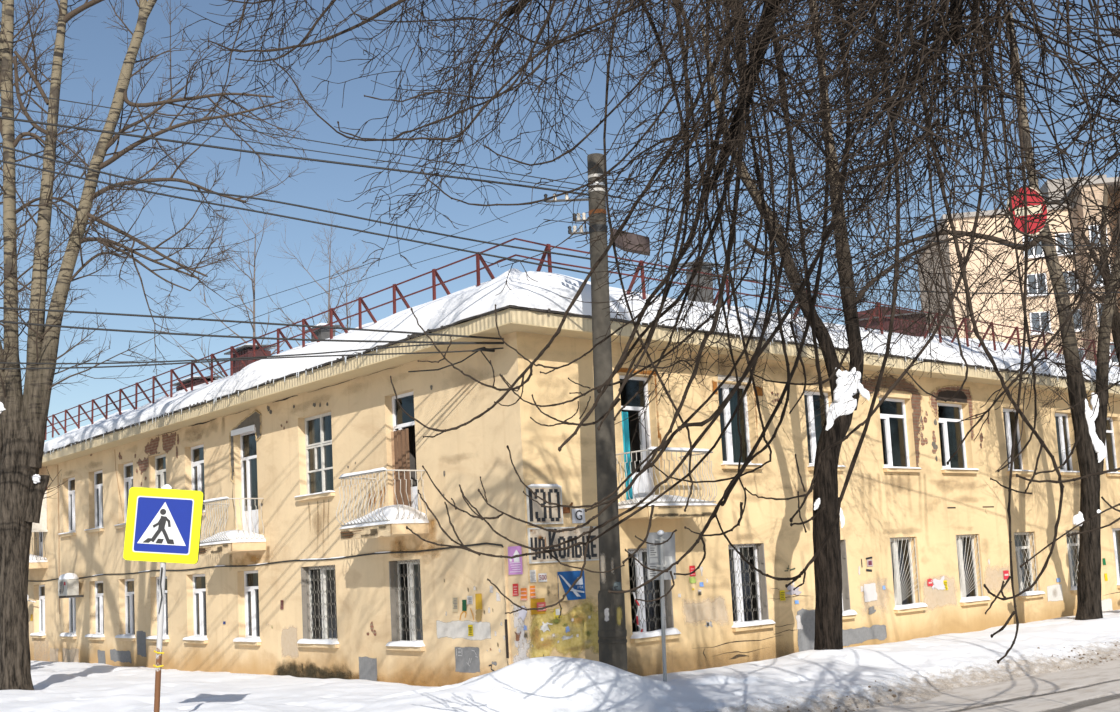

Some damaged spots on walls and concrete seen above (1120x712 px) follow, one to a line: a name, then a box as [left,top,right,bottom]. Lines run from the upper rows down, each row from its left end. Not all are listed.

peeling [118,432,179,486]